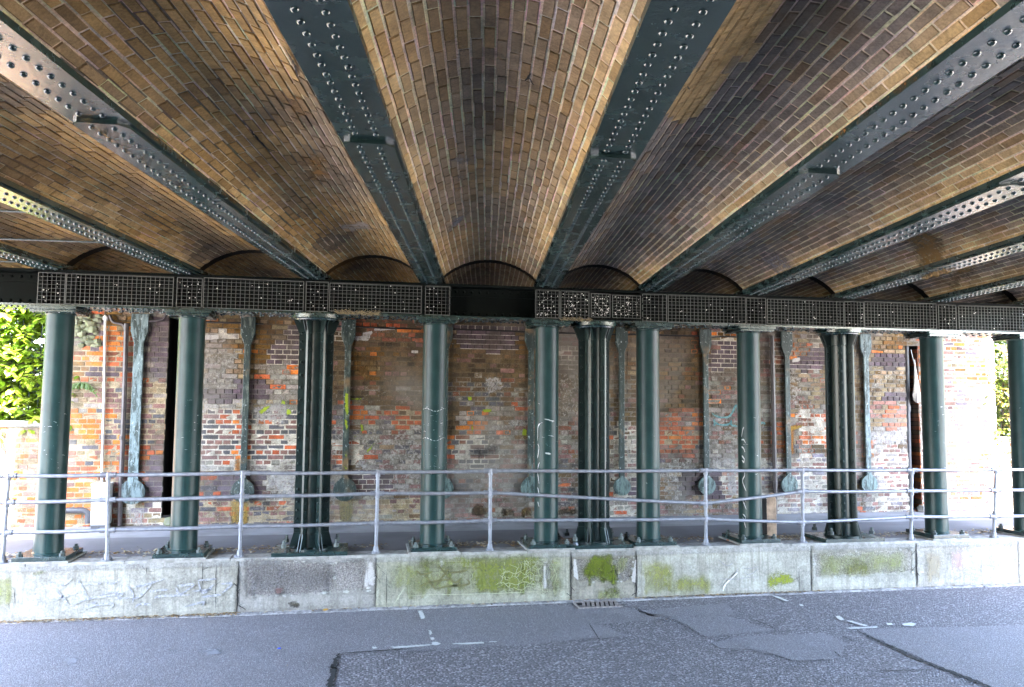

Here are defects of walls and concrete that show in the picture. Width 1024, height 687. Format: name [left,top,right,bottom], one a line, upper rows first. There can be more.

water stain [573,559,615,597]